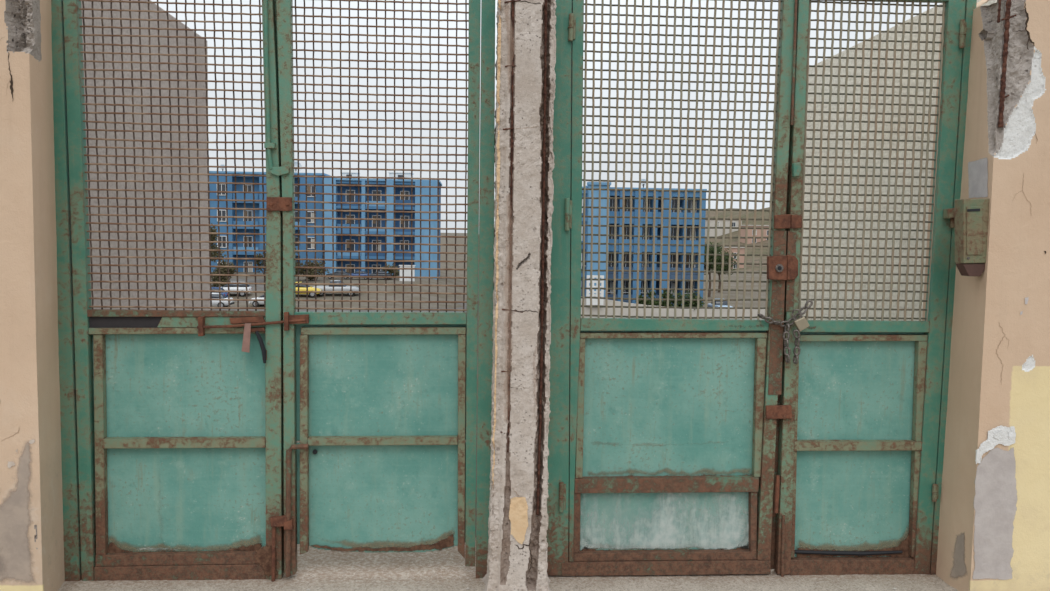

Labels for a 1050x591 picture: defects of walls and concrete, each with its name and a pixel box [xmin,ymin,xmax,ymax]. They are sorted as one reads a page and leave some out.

spalling [4,0,42,62]
crack [1016,4,1035,50]
crack [0,38,13,98]
spalling [968,0,1046,198]
spalling [536,0,547,515]
peeling [1022,355,1036,372]
peeling [975,425,1016,464]